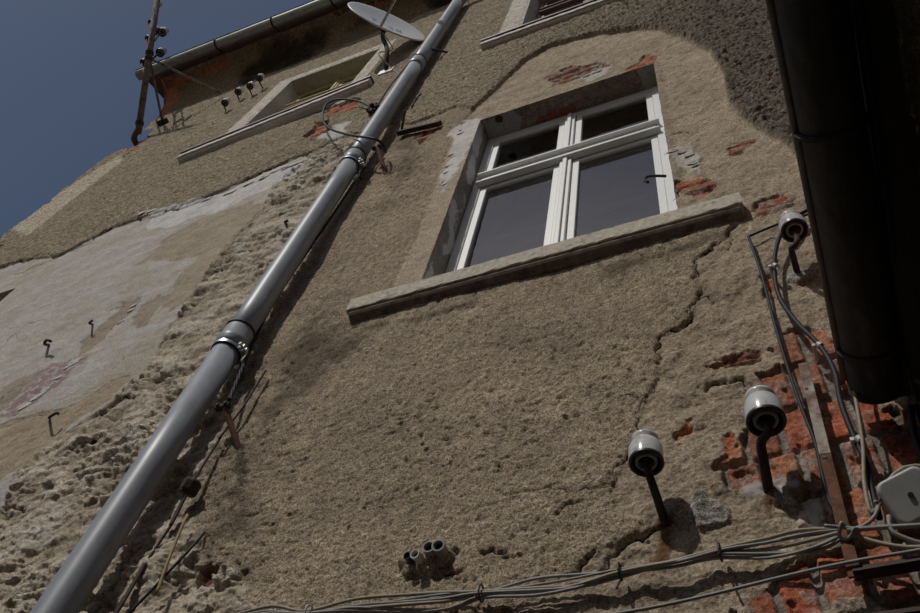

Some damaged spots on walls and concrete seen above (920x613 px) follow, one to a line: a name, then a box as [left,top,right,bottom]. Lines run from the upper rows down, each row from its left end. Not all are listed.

flaking render [544,61,613,86]
peeling [626,55,657,89]
peeling [303,97,361,145]
peeling [664,146,720,197]
flaking render [750,193,797,217]
peeling [0,155,315,507]
crack [617,230,733,430]
flaking render [672,417,694,441]
flaking render [706,326,920,565]
crack [501,456,628,515]
crack [579,530,660,573]
flaking render [748,548,920,613]